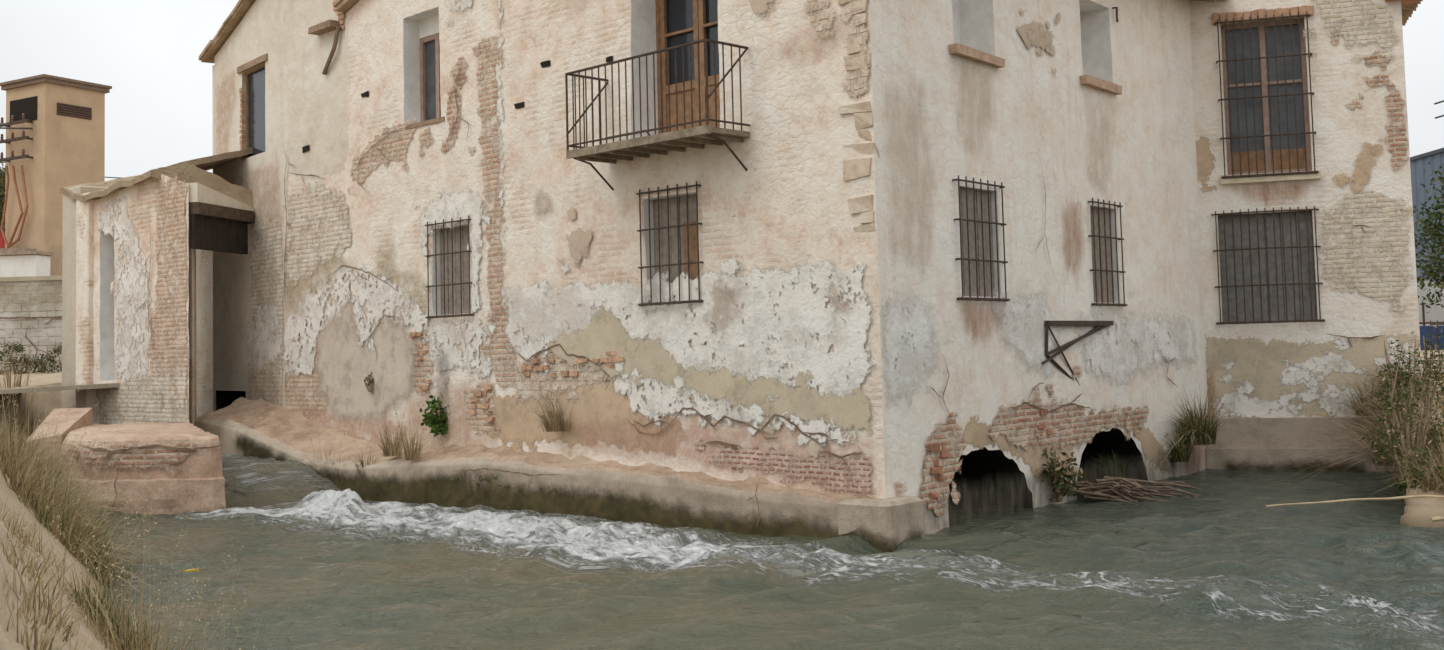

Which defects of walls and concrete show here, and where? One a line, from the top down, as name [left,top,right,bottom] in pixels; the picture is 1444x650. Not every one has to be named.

flaking render [804,0,870,99]
flaking render [1017,9,1061,76]
flaking render [1196,136,1217,193]
flaking render [1303,0,1415,314]
flaking render [96,174,188,425]
flaking render [246,35,936,496]
crack [514,344,625,386]
crack [626,407,866,465]
flaking render [895,290,1170,517]
flaking render [1073,310,1422,418]